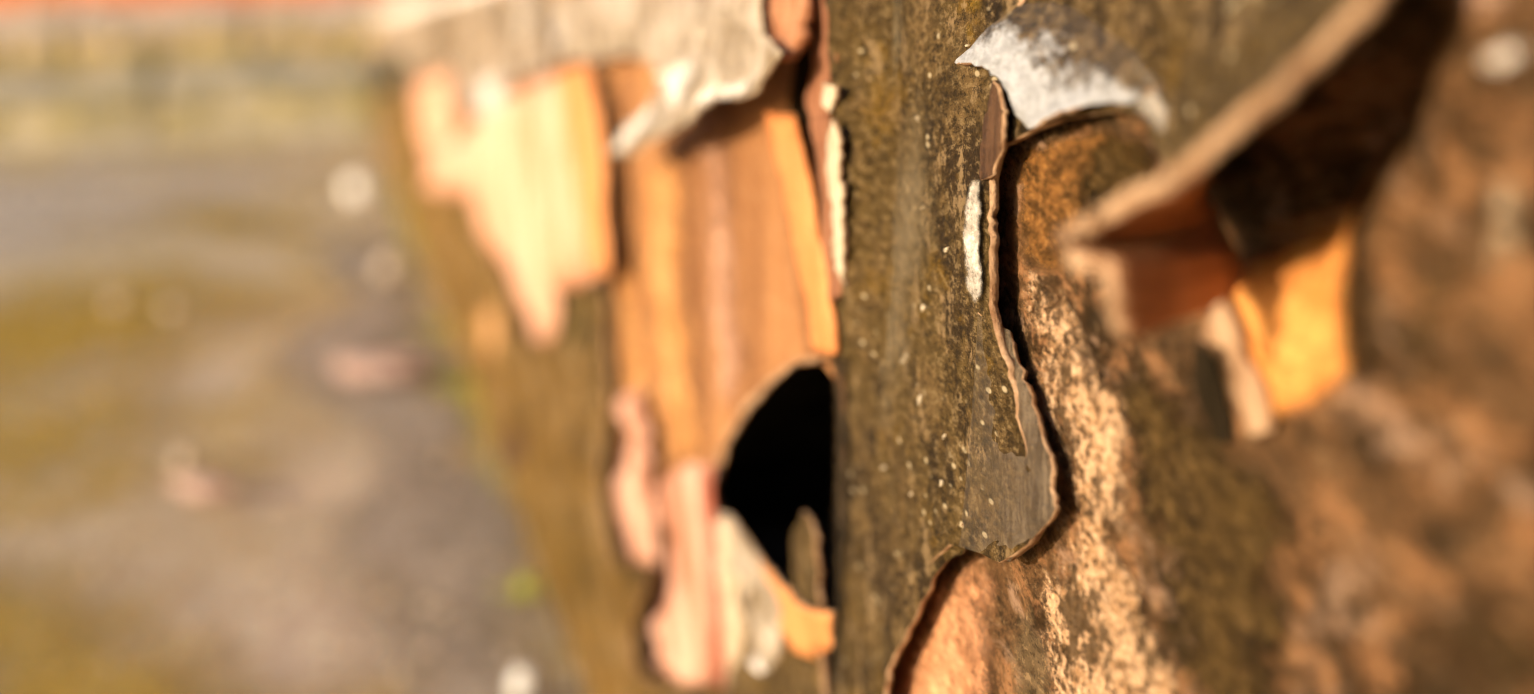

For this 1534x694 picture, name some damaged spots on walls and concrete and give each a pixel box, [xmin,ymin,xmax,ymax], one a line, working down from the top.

spalling [415,0,920,690]
spalling [865,0,1534,694]